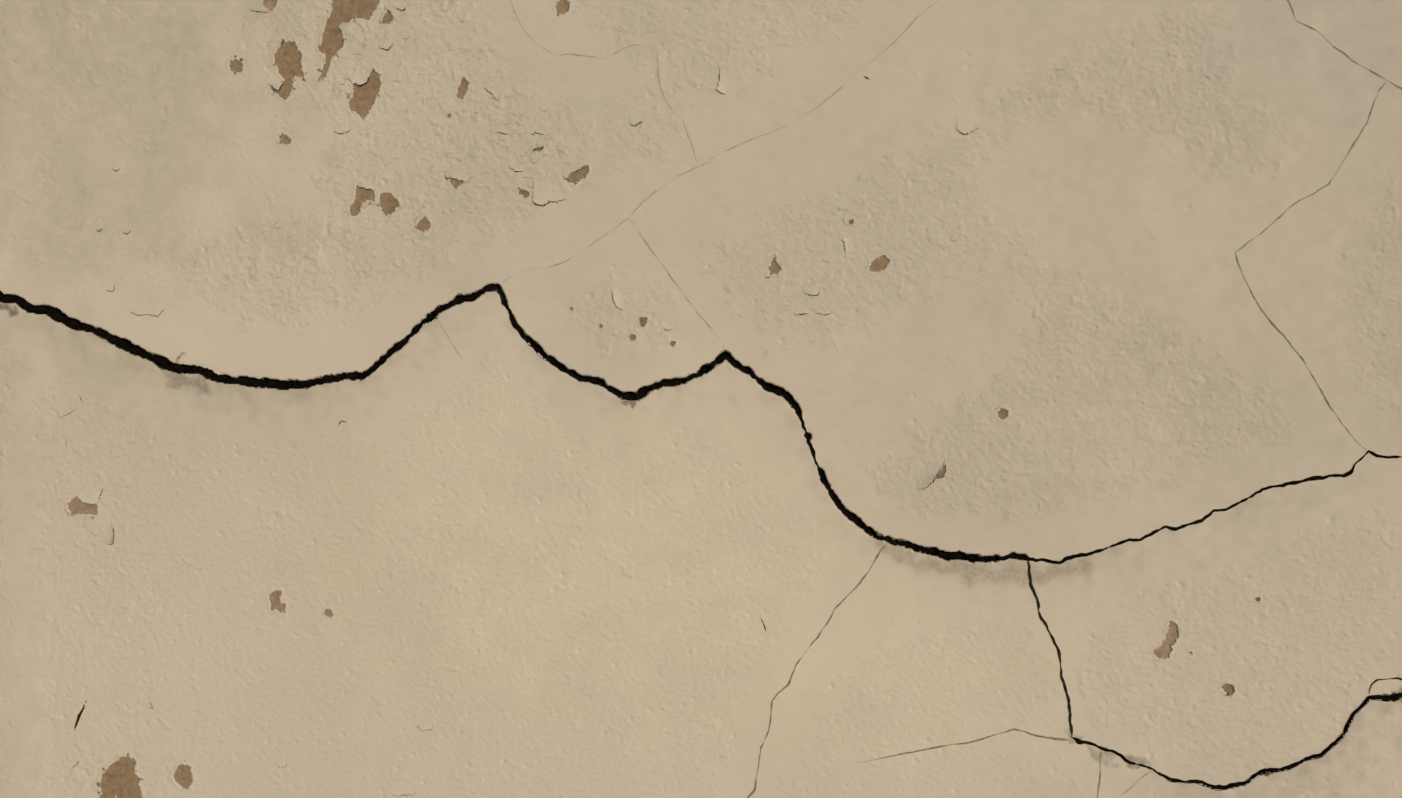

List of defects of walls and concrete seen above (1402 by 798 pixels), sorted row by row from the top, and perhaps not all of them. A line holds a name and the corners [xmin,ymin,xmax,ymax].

peeling [551,0,574,20]
crack [510,0,635,60]
crack [1287,0,1360,65]
peeling [265,0,407,135]
peeling [275,132,294,149]
crack [725,84,845,151]
crack [579,72,718,330]
crack [1235,69,1402,450]
peeling [63,488,115,545]
crack [0,283,1402,798]
peeling [1150,617,1195,664]
peeling [95,752,146,798]